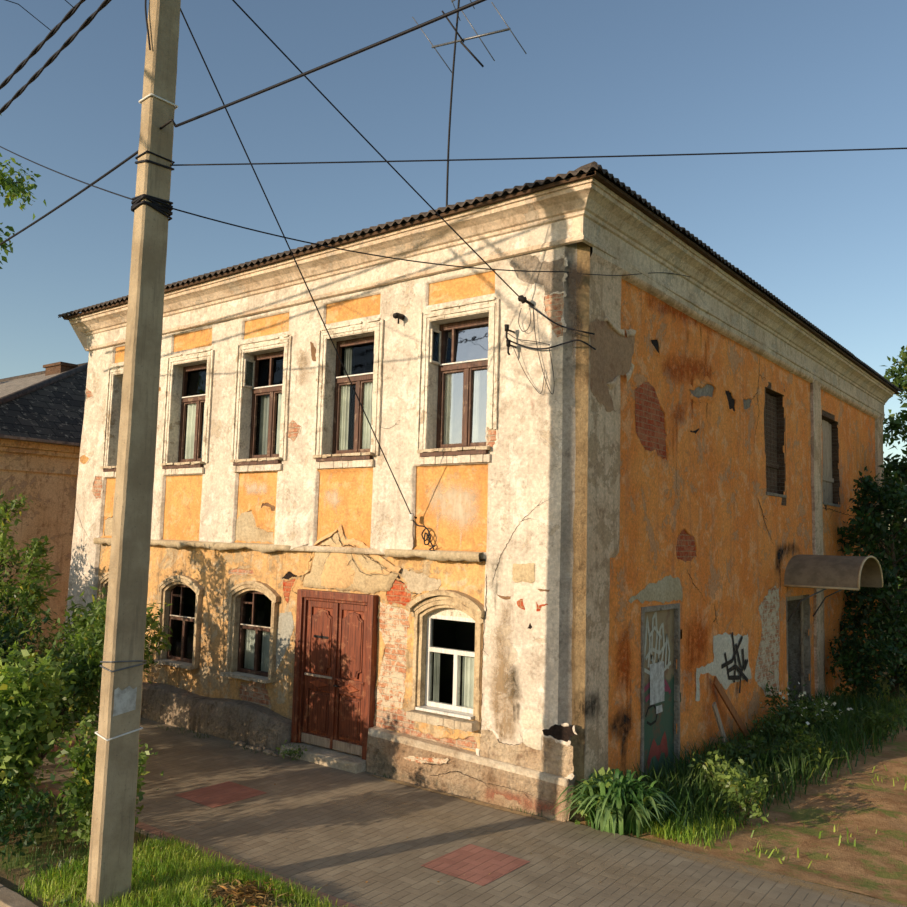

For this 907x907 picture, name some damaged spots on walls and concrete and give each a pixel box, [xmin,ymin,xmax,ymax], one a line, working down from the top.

flaking render [509,252,568,339]
water stain [567,264,583,339]
flaking render [589,315,670,468]
flaking render [287,418,302,442]
flaking render [235,500,276,544]
flaking render [673,523,698,570]
flaking render [275,531,577,780]